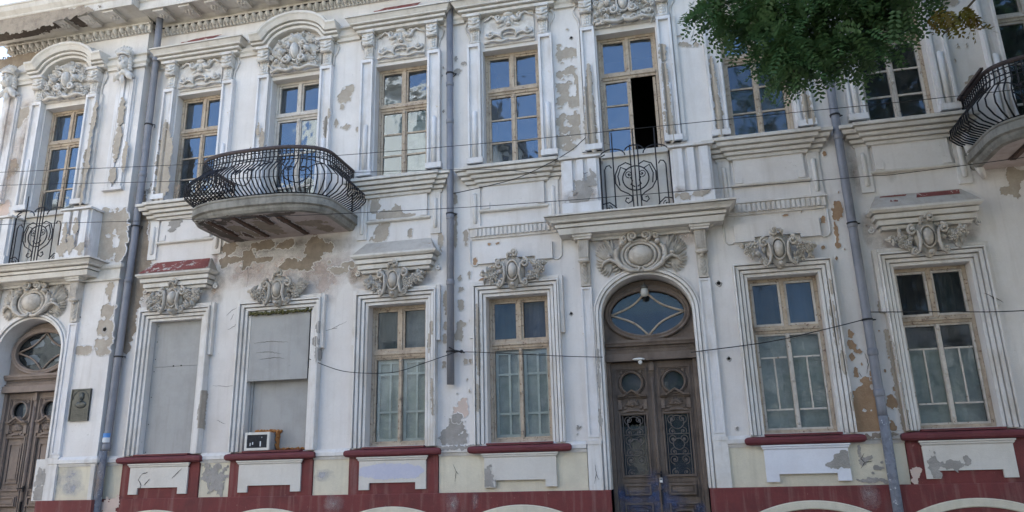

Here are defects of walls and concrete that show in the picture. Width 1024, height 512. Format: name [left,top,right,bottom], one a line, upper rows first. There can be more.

peeling [108,97,129,183]
peeling [323,84,358,138]
peeling [554,28,598,153]
peeling [998,167,1024,200]
peeling [97,206,131,263]
peeling [168,211,356,276]
peeling [368,198,416,243]
peeling [819,190,847,262]
peeling [75,281,118,357]
flaking render [427,191,502,445]
flaking render [825,279,911,484]
peeling [910,450,971,484]